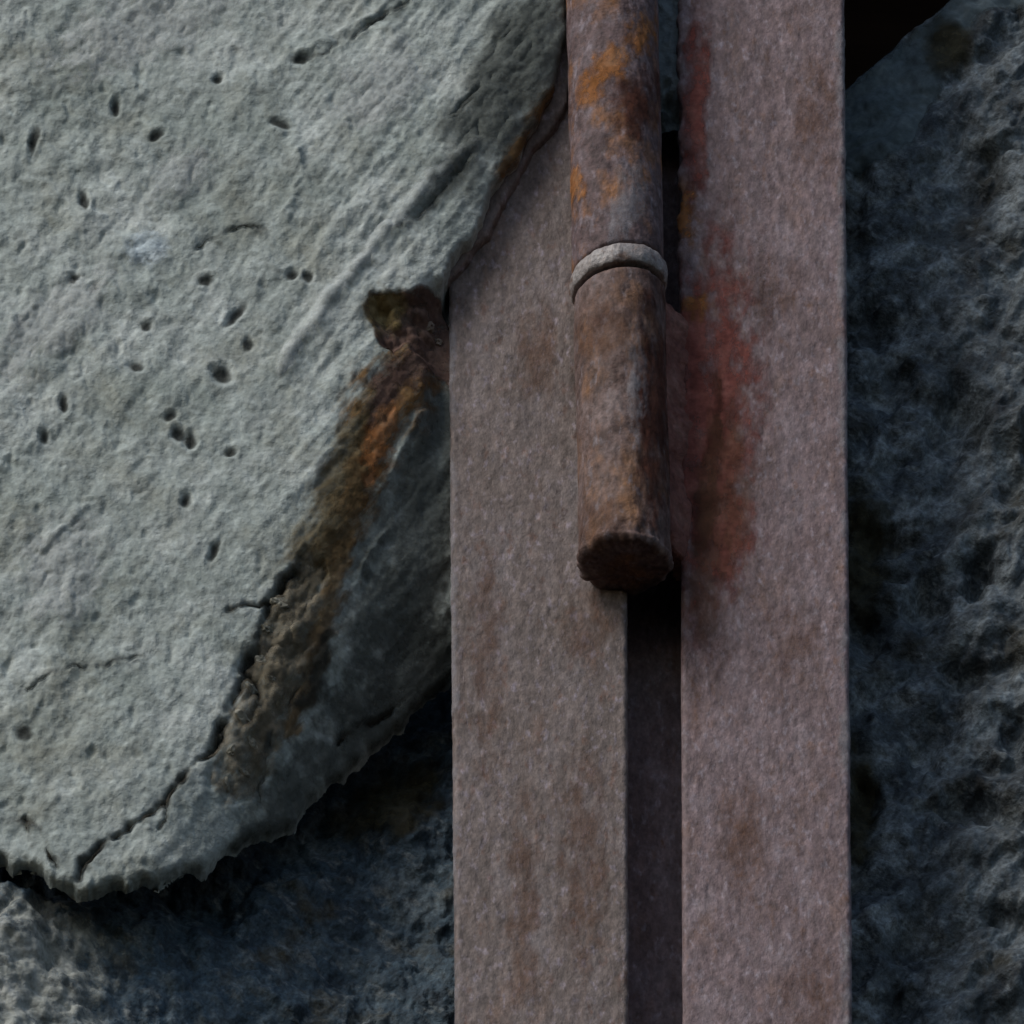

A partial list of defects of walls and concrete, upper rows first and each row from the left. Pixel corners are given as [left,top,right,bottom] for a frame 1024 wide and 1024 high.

rust [576,13,661,139]
rust [677,23,731,253]
rust [635,333,670,526]
rust [678,265,761,612]
crack [16,818,35,829]
crack [26,654,139,690]
crack [46,568,298,881]
rust [243,342,441,777]